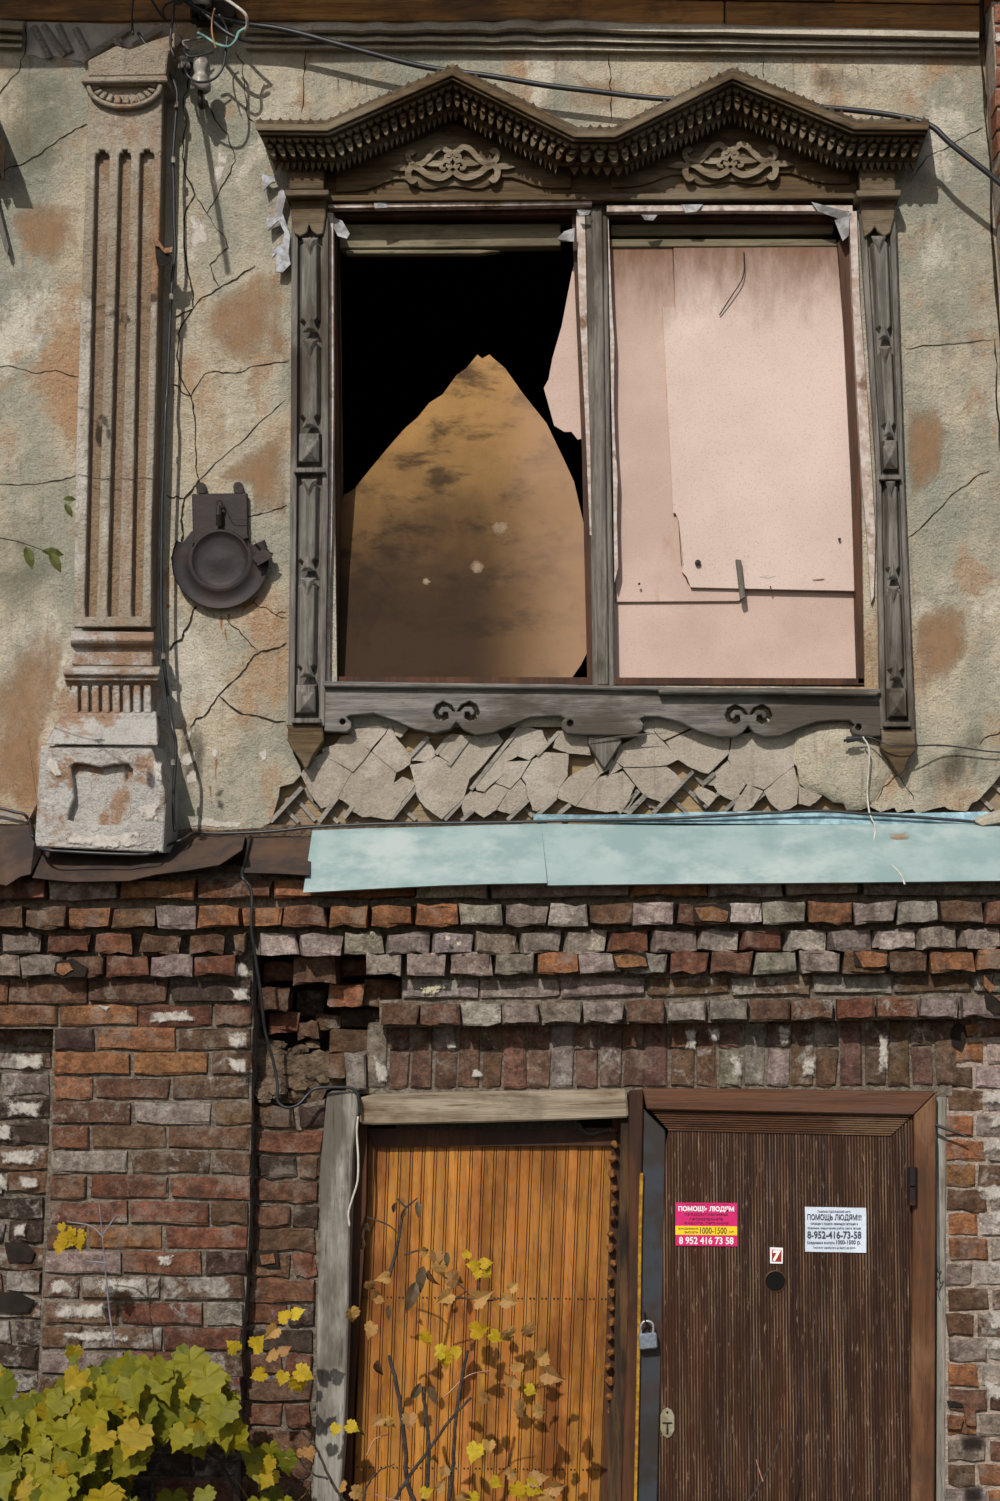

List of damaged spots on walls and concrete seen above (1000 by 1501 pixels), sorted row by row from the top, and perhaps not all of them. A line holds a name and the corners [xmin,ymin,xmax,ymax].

crack [0,52,289,542]
peeling [47,757,61,776]
peeling [153,760,162,780]
flaking render [271,719,822,824]
peeling [64,803,158,848]
peeling [232,963,248,1000]
spalling [266,974,402,1052]
peeling [229,1033,246,1072]